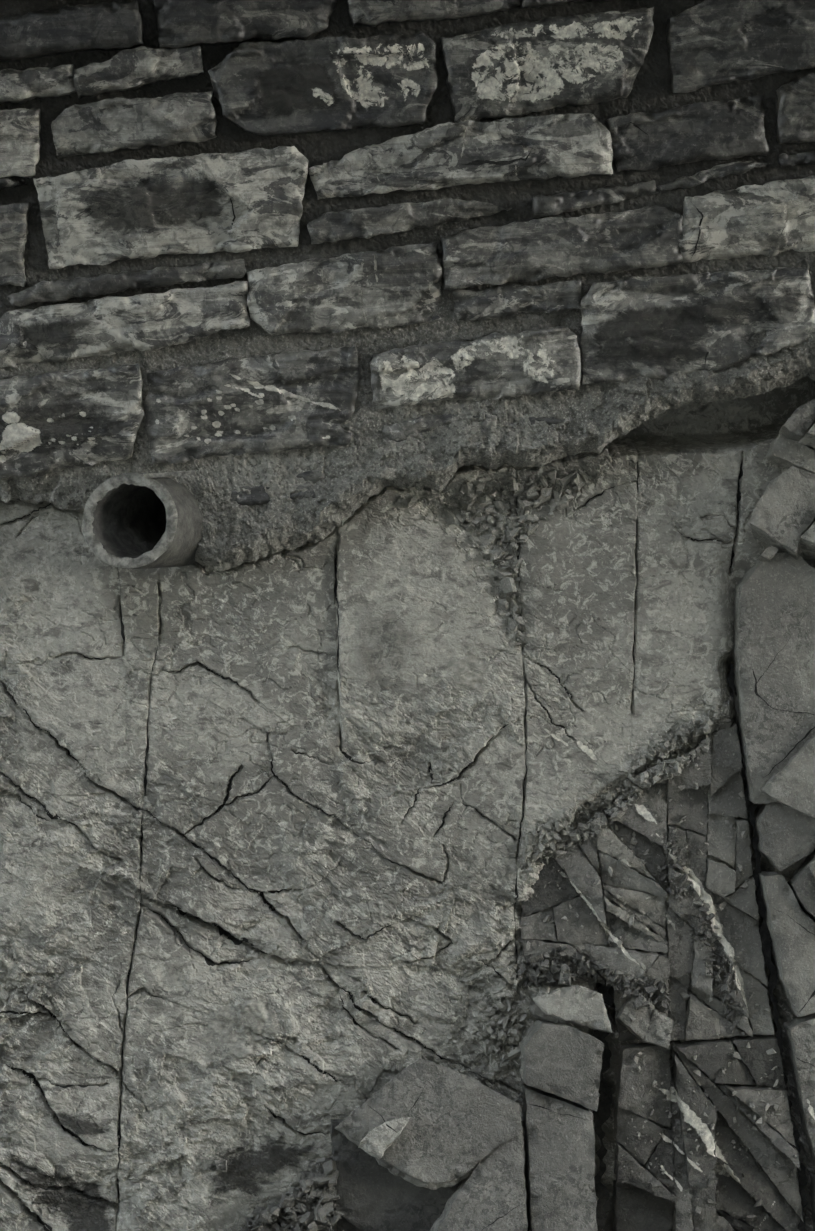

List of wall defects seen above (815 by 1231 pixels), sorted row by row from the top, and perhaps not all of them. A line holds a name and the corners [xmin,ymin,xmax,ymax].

crack [1,503,51,535]
crack [678,453,743,570]
crack [577,460,639,709]
crack [0,542,575,1213]
crack [727,595,815,1231]
spalling [524,964,673,1050]
crack [530,983,614,1231]
crack [0,1162,59,1231]
spalling [376,1158,477,1190]